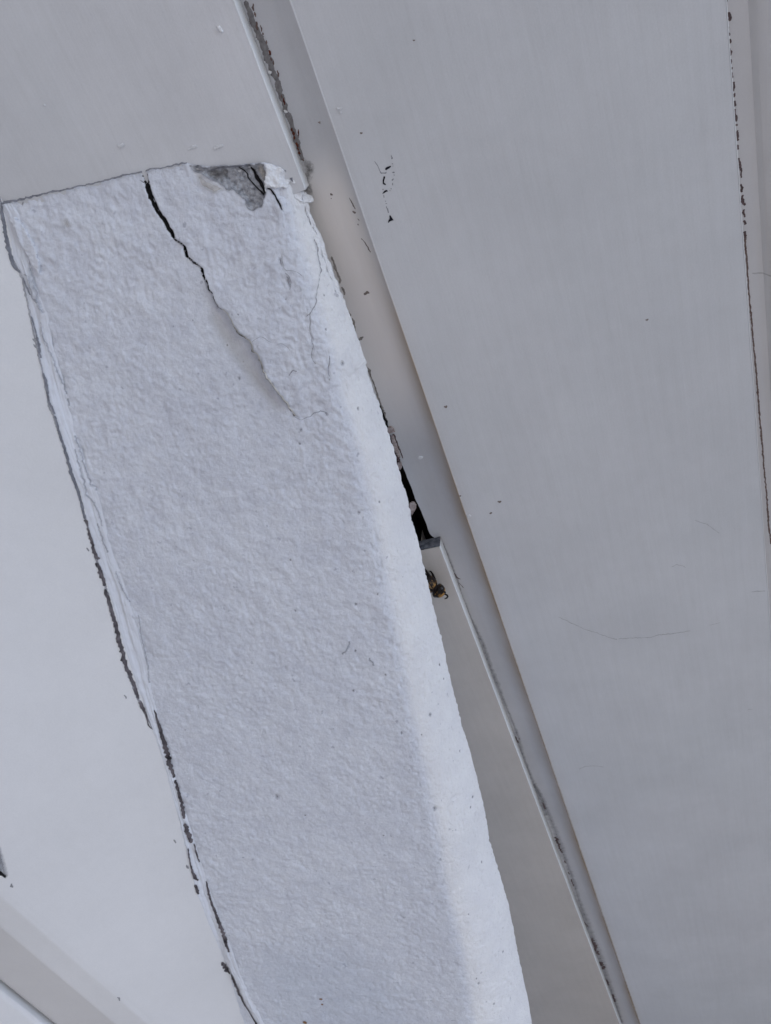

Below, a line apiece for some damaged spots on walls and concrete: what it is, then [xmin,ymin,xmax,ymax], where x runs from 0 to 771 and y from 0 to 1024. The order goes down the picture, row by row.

crack [0,162,324,1024]
flaking render [189,163,314,211]